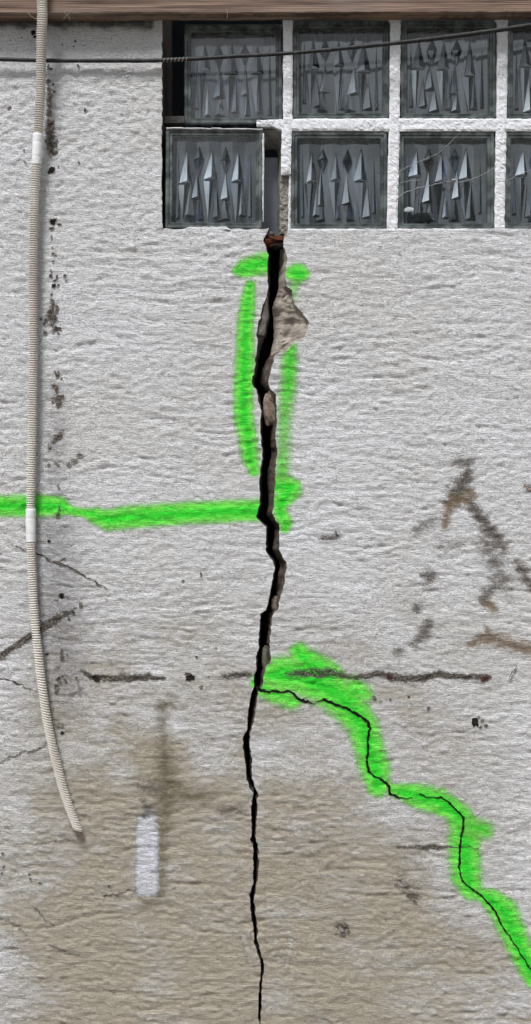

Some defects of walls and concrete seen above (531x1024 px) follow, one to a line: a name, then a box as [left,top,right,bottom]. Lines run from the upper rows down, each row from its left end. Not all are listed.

corrosion [264,231,284,250]
spalling [270,287,309,356]
crack [80,230,531,1024]